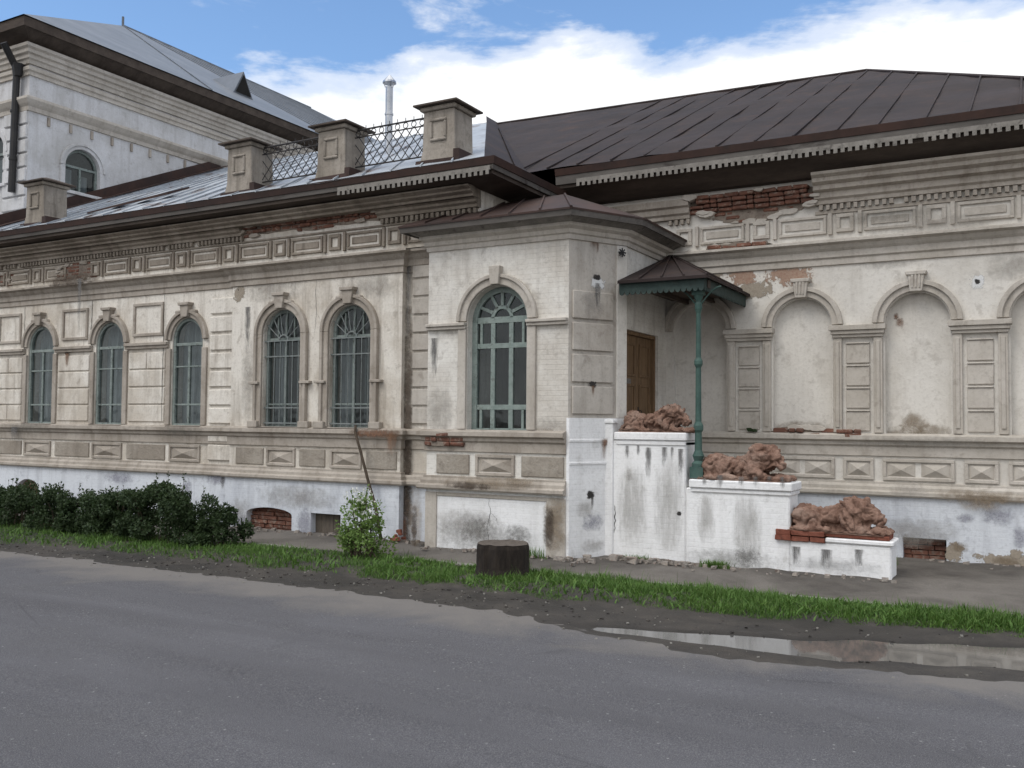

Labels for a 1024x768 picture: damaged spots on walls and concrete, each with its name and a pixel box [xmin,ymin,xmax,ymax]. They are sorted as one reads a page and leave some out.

spalling [682,184,820,224]
spalling [238,210,380,238]
spalling [706,240,771,250]
flaking render [714,268,812,299]
spalling [424,433,465,447]
leakage [626,445,683,468]
flaking render [945,541,1024,566]